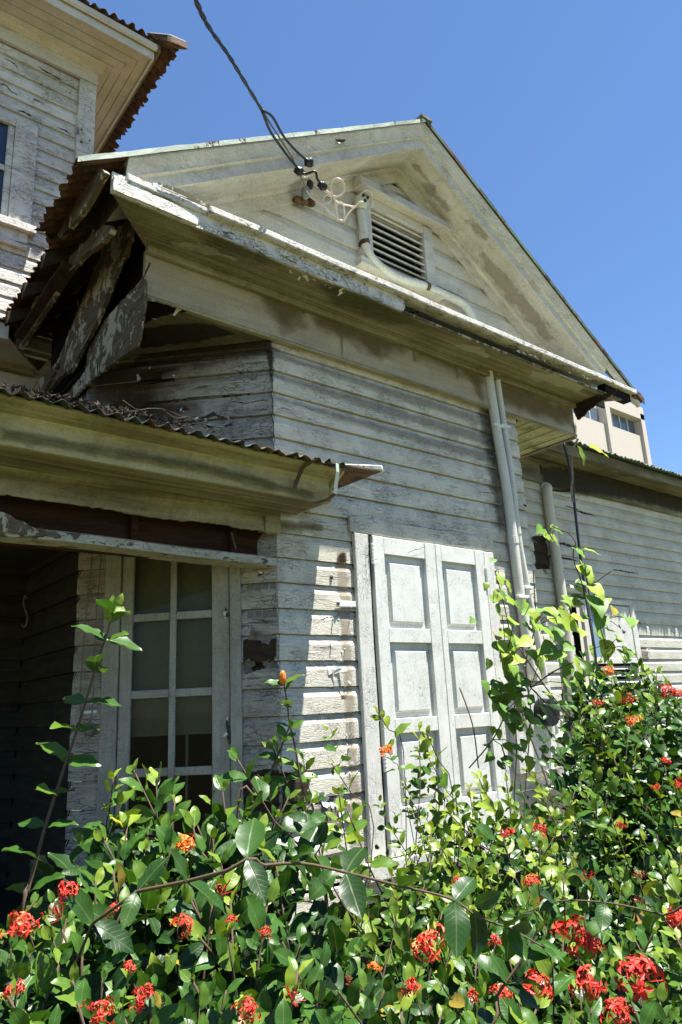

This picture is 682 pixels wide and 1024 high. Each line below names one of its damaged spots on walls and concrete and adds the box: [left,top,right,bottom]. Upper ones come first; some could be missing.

leakage [205,240,268,262]
leakage [266,298,305,326]
leakage [323,287,414,324]
leakage [481,254,550,339]
leakage [318,317,402,355]
leakage [88,324,503,529]
leakage [4,431,313,496]
peeling [243,627,277,674]